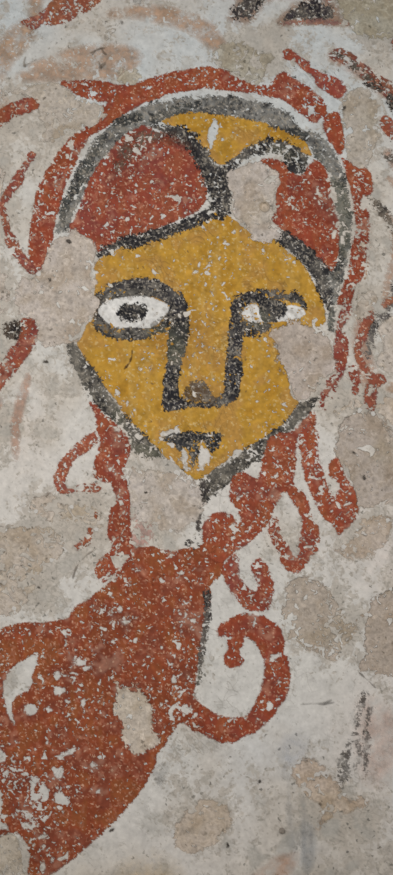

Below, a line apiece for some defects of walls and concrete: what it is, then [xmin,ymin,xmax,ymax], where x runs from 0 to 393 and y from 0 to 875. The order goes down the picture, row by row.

spalling [337,0,393,40]
spalling [226,161,283,244]
spalling [269,318,337,401]
spalling [334,395,393,560]
spalling [280,575,393,676]
spalling [112,681,161,756]
spalling [171,799,235,854]
spalling [292,758,368,830]